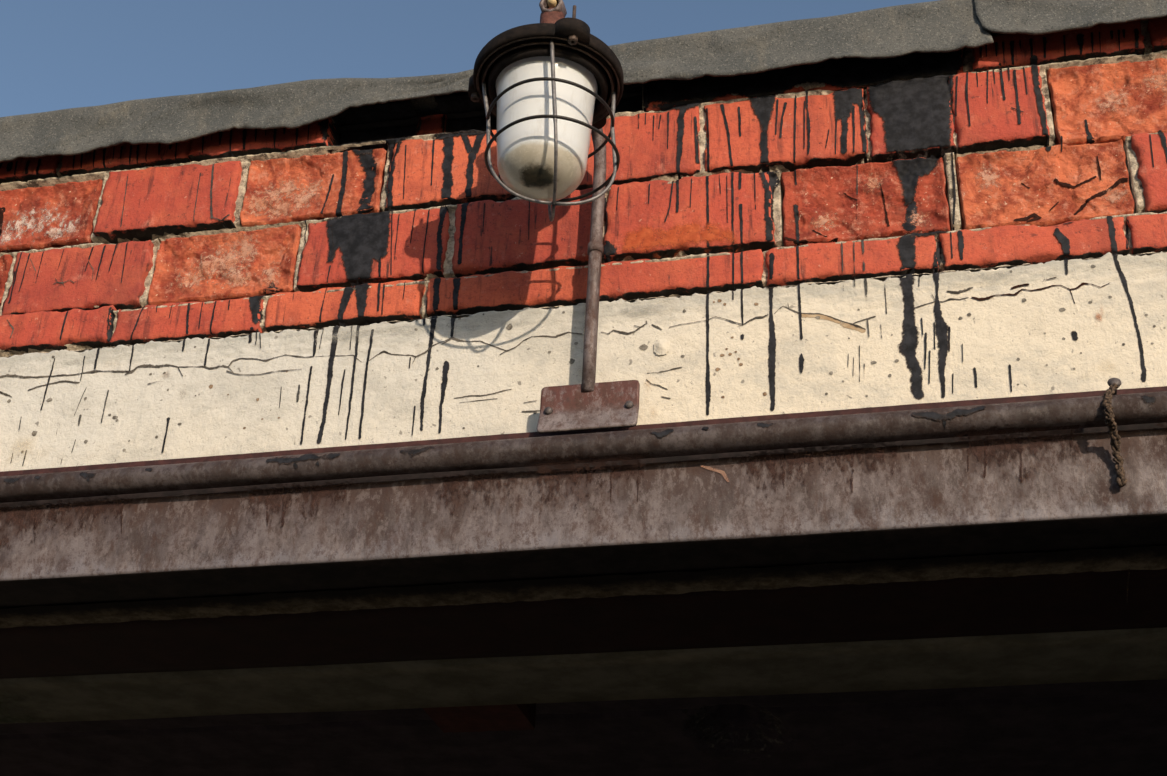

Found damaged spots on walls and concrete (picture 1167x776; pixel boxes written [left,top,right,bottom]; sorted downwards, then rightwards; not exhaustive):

crack [1021,156,1129,215]
water stain [2,251,44,310]
water stain [266,132,486,468]
water stain [841,240,868,297]
water stain [896,152,986,428]
crack [915,277,1109,308]
crack [0,305,876,399]
water stain [847,287,887,382]
corrosion [430,453,652,516]
corrosion [732,442,909,498]
corrosion [952,425,1088,483]
corrosion [0,493,132,548]